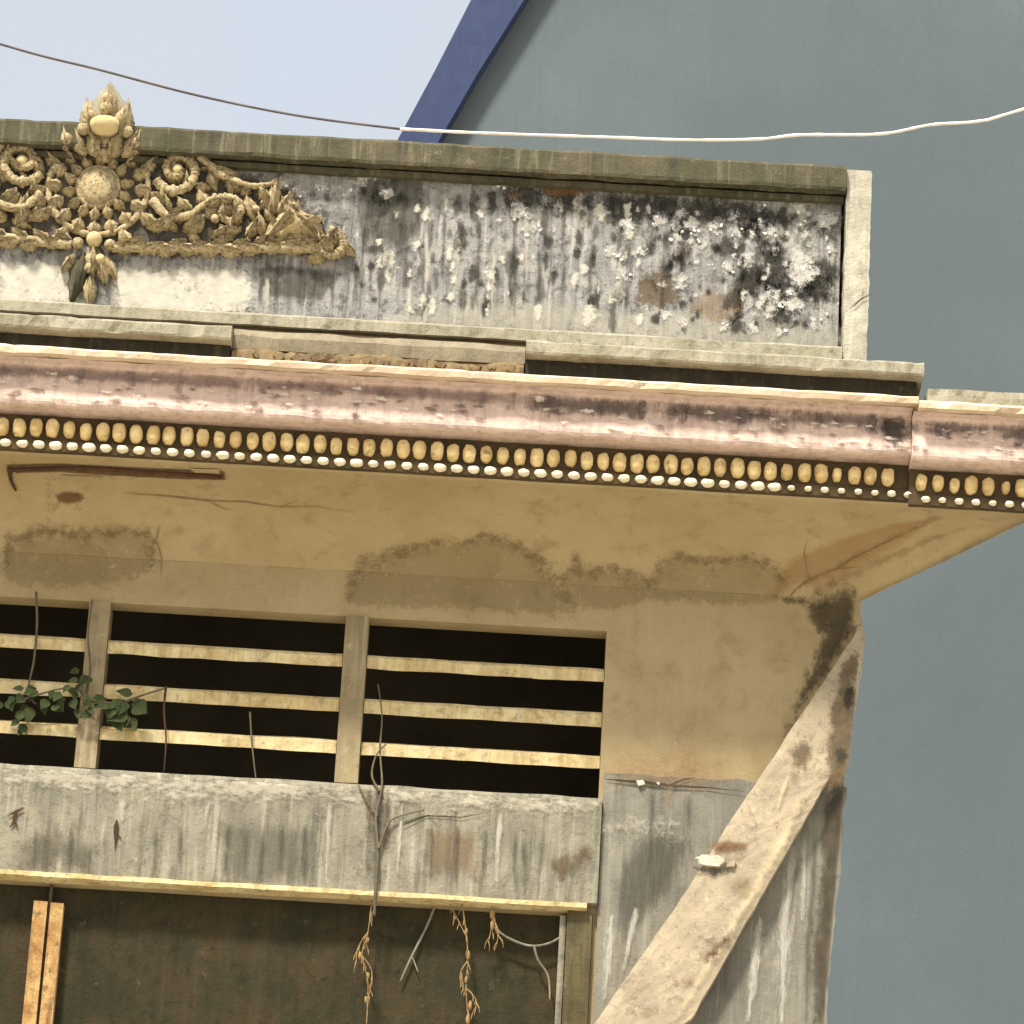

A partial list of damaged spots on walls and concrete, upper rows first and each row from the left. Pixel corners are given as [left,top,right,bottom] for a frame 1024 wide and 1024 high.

damp [475,186,594,251]
damp [461,256,499,292]
damp [543,234,558,283]
damp [573,229,594,258]
damp [608,193,840,334]
damp [0,366,240,387]
damp [259,380,647,419]
damp [669,404,784,427]
damp [793,411,1024,446]
damp [6,771,304,819]
damp [780,591,858,1023]
damp [749,919,761,1017]